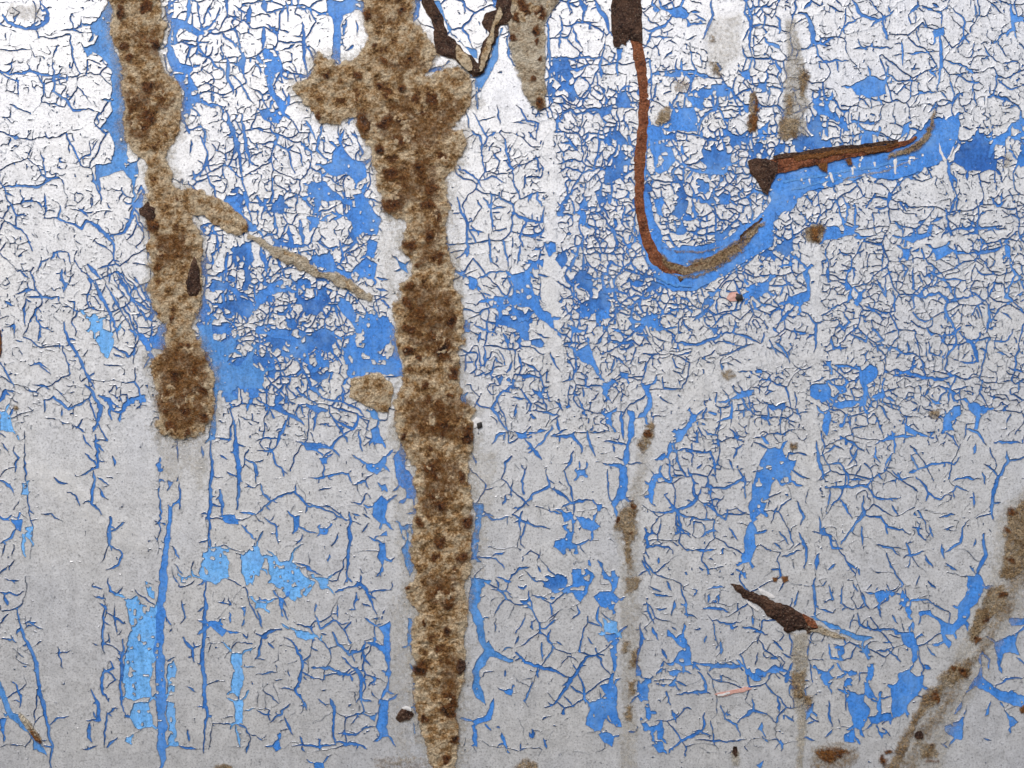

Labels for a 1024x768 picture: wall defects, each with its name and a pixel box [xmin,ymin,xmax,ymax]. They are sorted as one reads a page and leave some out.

crack [0,1,144,768]
peeling [115,457,335,768]
corrosion [108,0,373,439]
crack [172,383,393,751]
corrosion [292,0,559,768]
crack [453,0,634,263]
peeling [453,238,754,754]
corrosion [747,91,760,132]
crack [538,158,1023,403]
spalling [648,57,1024,245]
peeling [731,435,993,744]
corrosion [879,501,1024,768]